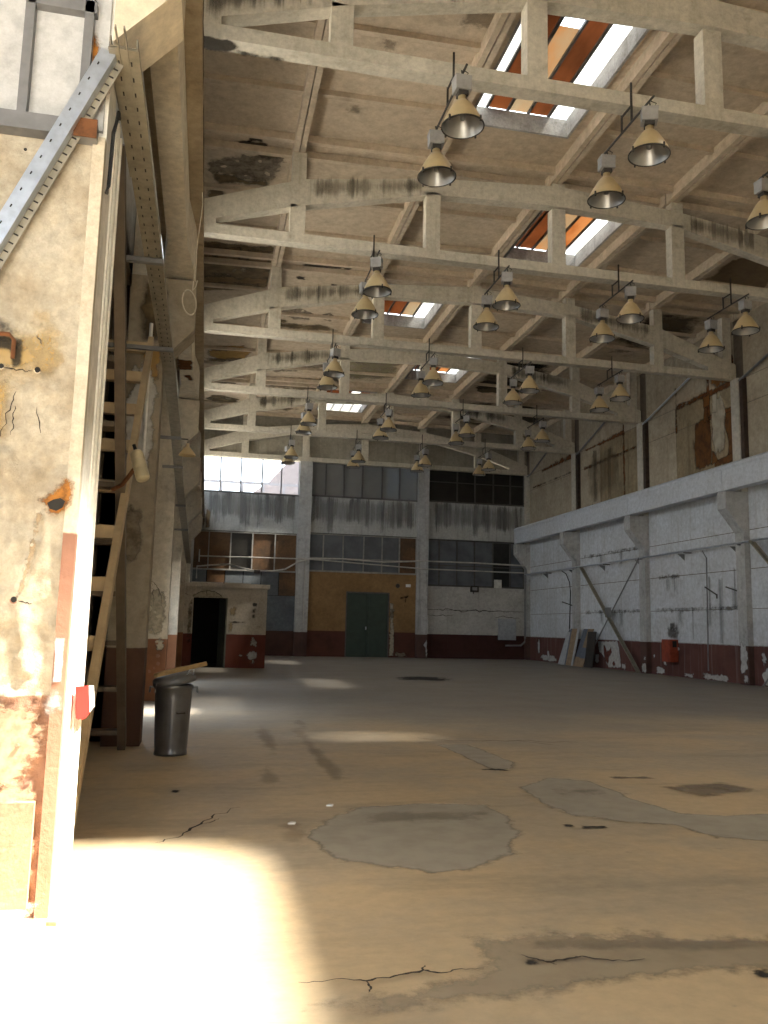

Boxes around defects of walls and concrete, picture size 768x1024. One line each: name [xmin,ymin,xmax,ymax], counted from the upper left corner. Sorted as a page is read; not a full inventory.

damp [208,138,284,197]
crack [0,392,41,436]
corrosion [38,479,72,514]
peeling [239,637,257,663]
peeling [595,641,626,670]
peeling [684,673,729,682]
peeling [740,642,748,683]
crack [155,807,237,843]
crack [524,955,645,964]
crack [300,966,478,992]